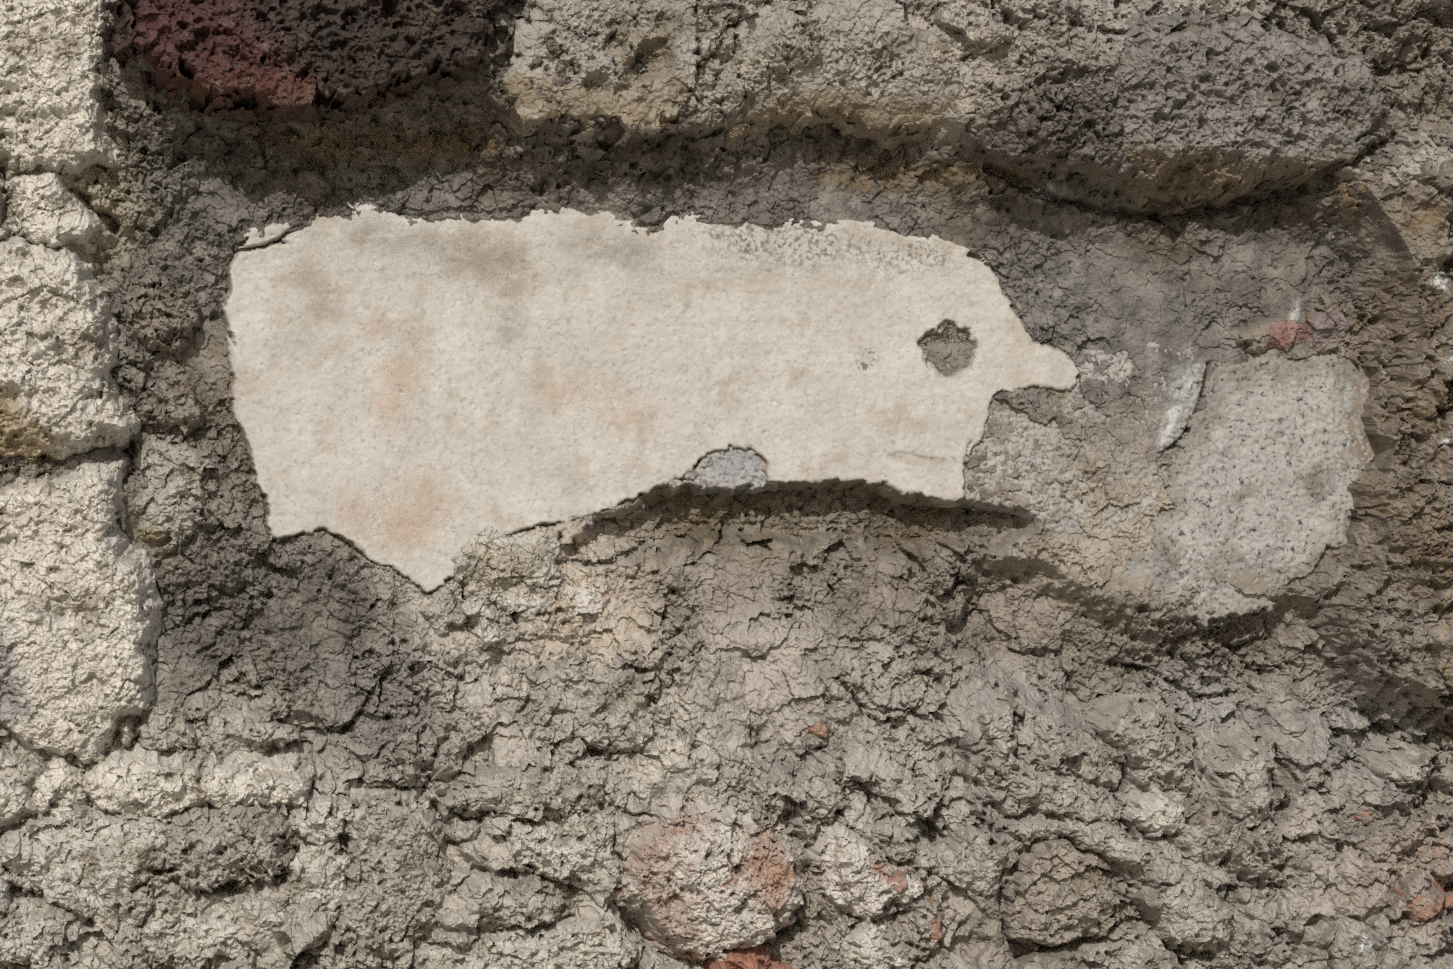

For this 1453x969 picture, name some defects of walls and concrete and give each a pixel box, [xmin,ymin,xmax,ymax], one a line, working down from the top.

spalling [925,322,973,352]
crack [1156,368,1207,453]
spalling [661,446,779,497]
crack [566,548,639,567]
crack [279,661,461,736]